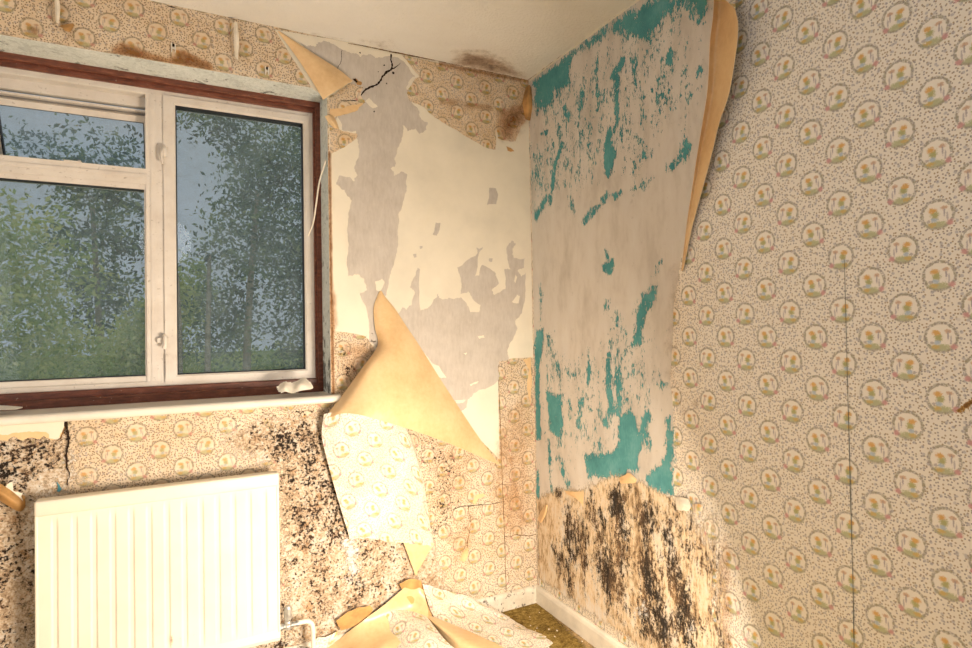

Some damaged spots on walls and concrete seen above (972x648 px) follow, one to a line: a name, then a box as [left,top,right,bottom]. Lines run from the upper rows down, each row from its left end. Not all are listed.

leakage [114,44,211,69]
crack [337,43,559,112]
leakage [440,55,527,82]
leakage [501,106,524,136]
leakage [329,152,355,394]
peeling [275,0,738,505]
peeling [0,422,64,441]
crack [58,421,71,486]
leakage [0,428,89,648]
leakage [218,406,467,648]
leakage [536,473,754,648]